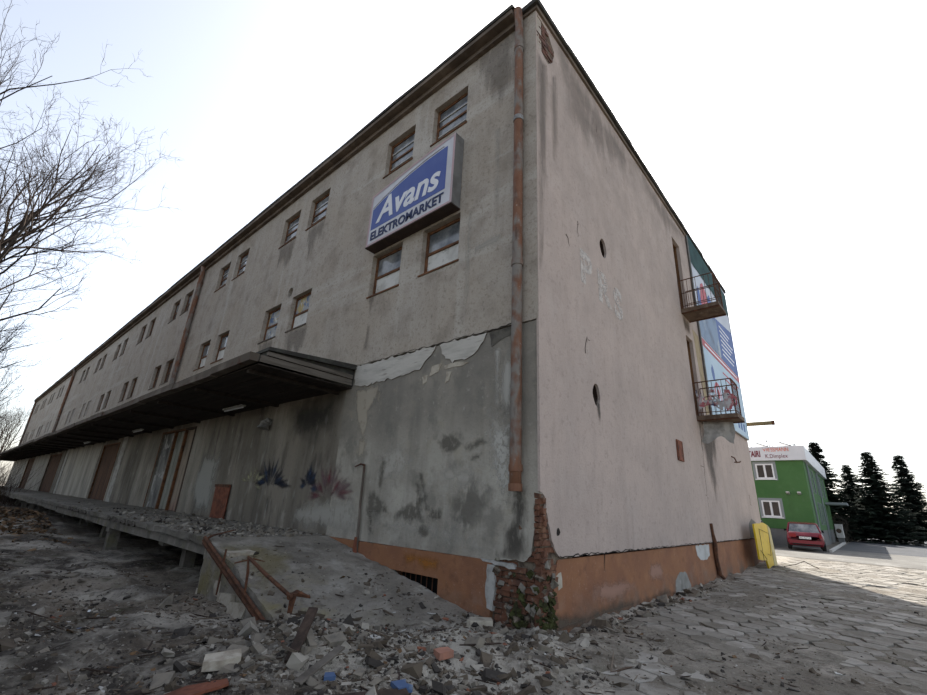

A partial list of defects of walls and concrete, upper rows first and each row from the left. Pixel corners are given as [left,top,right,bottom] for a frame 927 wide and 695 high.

spalling [537,25,554,64]
peeling [354,326,511,455]
water stain [295,501,355,530]
water stain [397,475,450,538]
water stain [442,420,524,555]
spalling [481,493,562,631]
peeling [695,544,710,560]